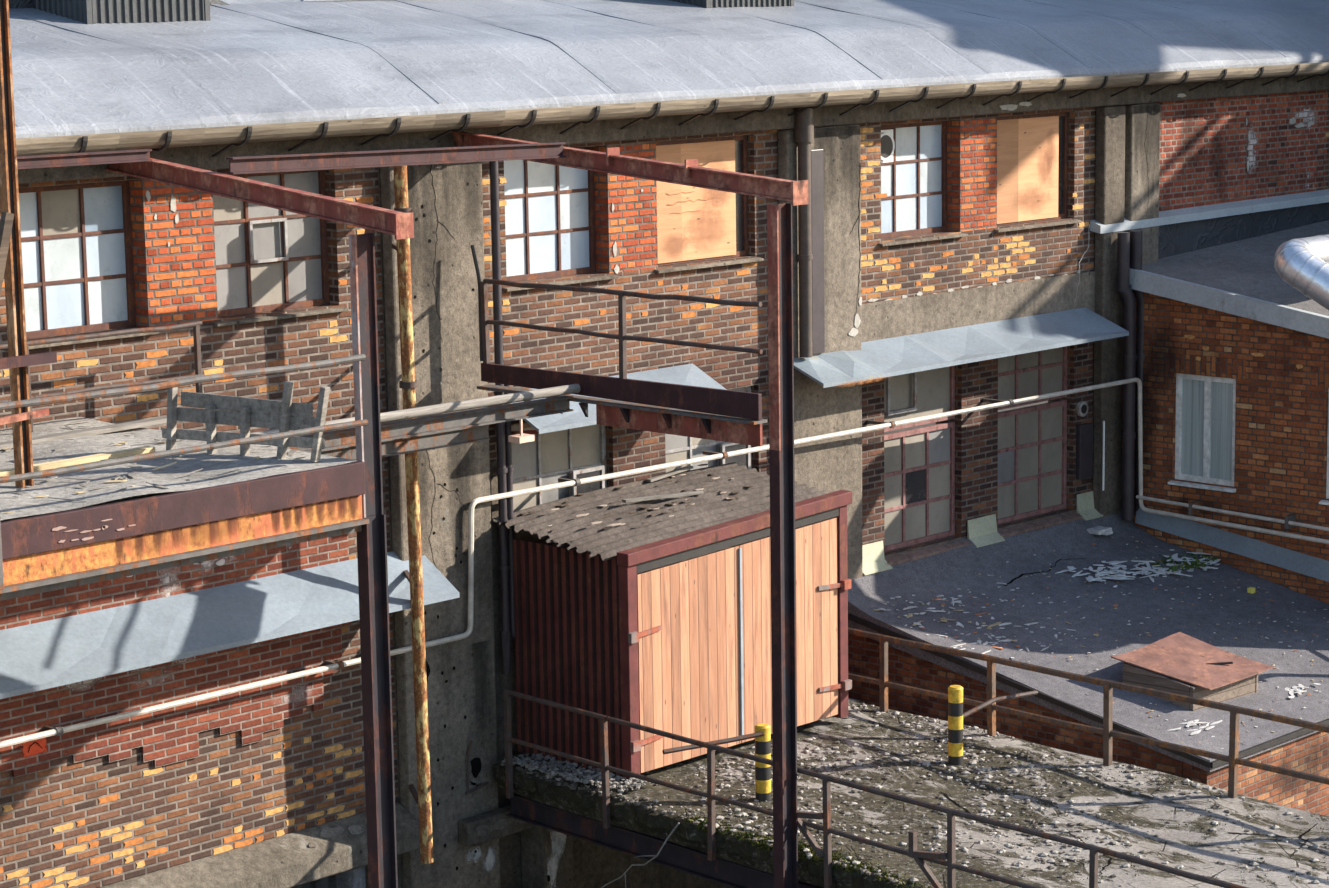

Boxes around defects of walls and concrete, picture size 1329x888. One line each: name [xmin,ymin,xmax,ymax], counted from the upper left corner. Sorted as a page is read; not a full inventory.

rust [272,495,358,530]
rust [116,517,244,556]